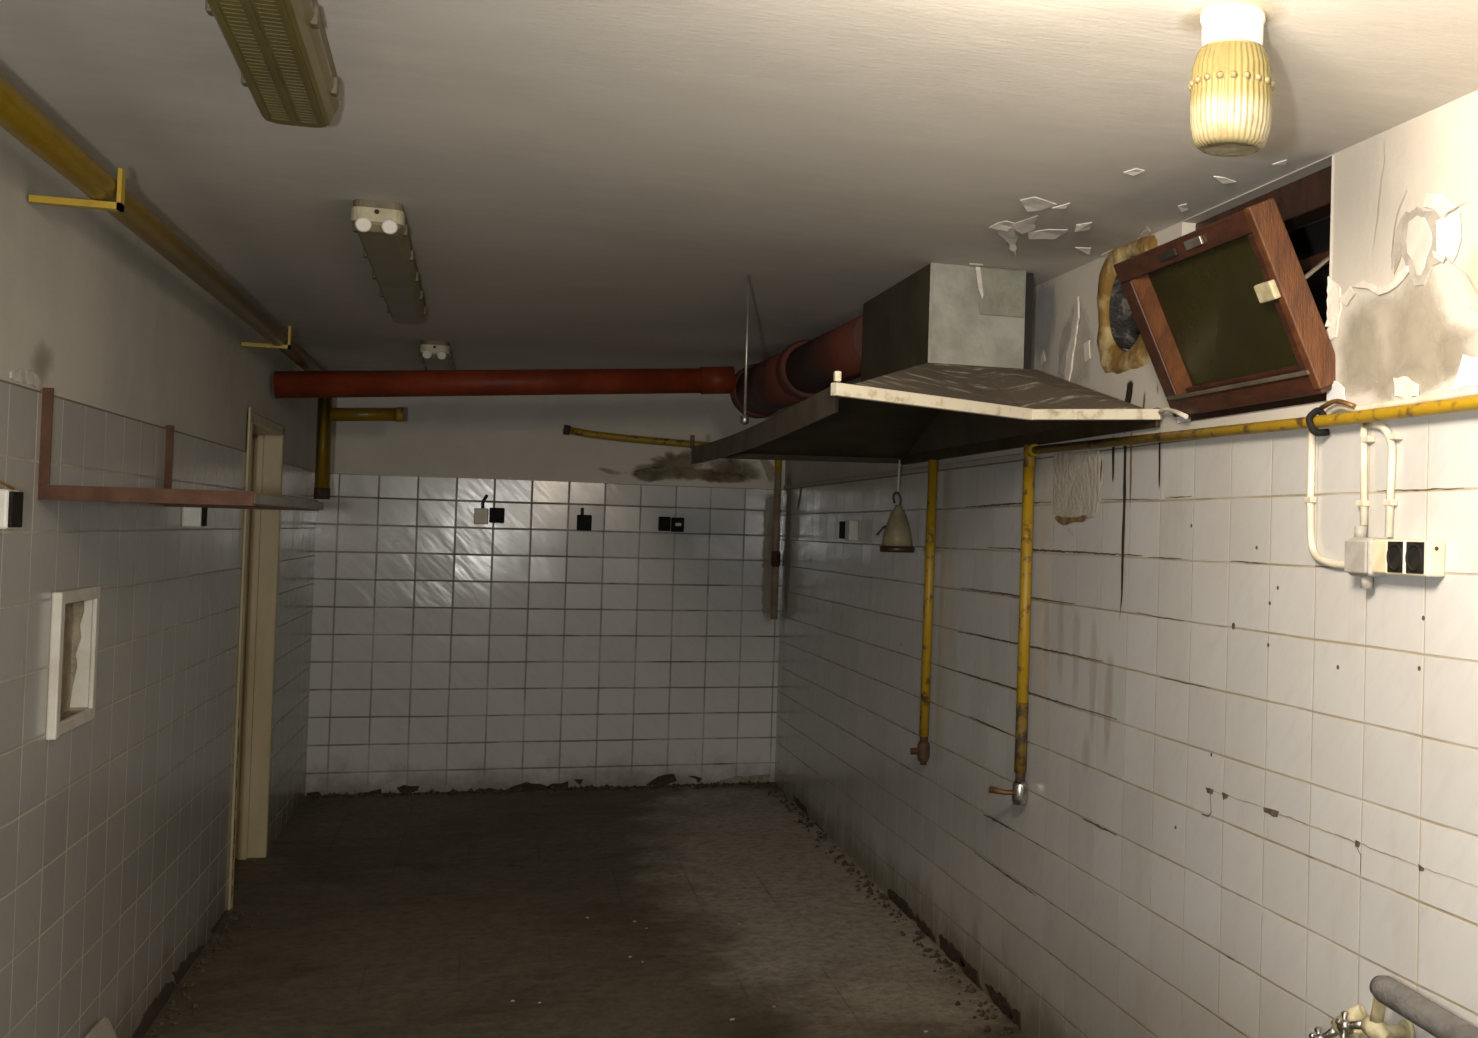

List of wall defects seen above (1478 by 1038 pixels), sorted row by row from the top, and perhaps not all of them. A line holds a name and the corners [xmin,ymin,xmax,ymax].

peeling [989,196,1113,257]
spalling [1325,193,1461,341]
damp [1346,275,1478,398]
damp [634,452,802,614]